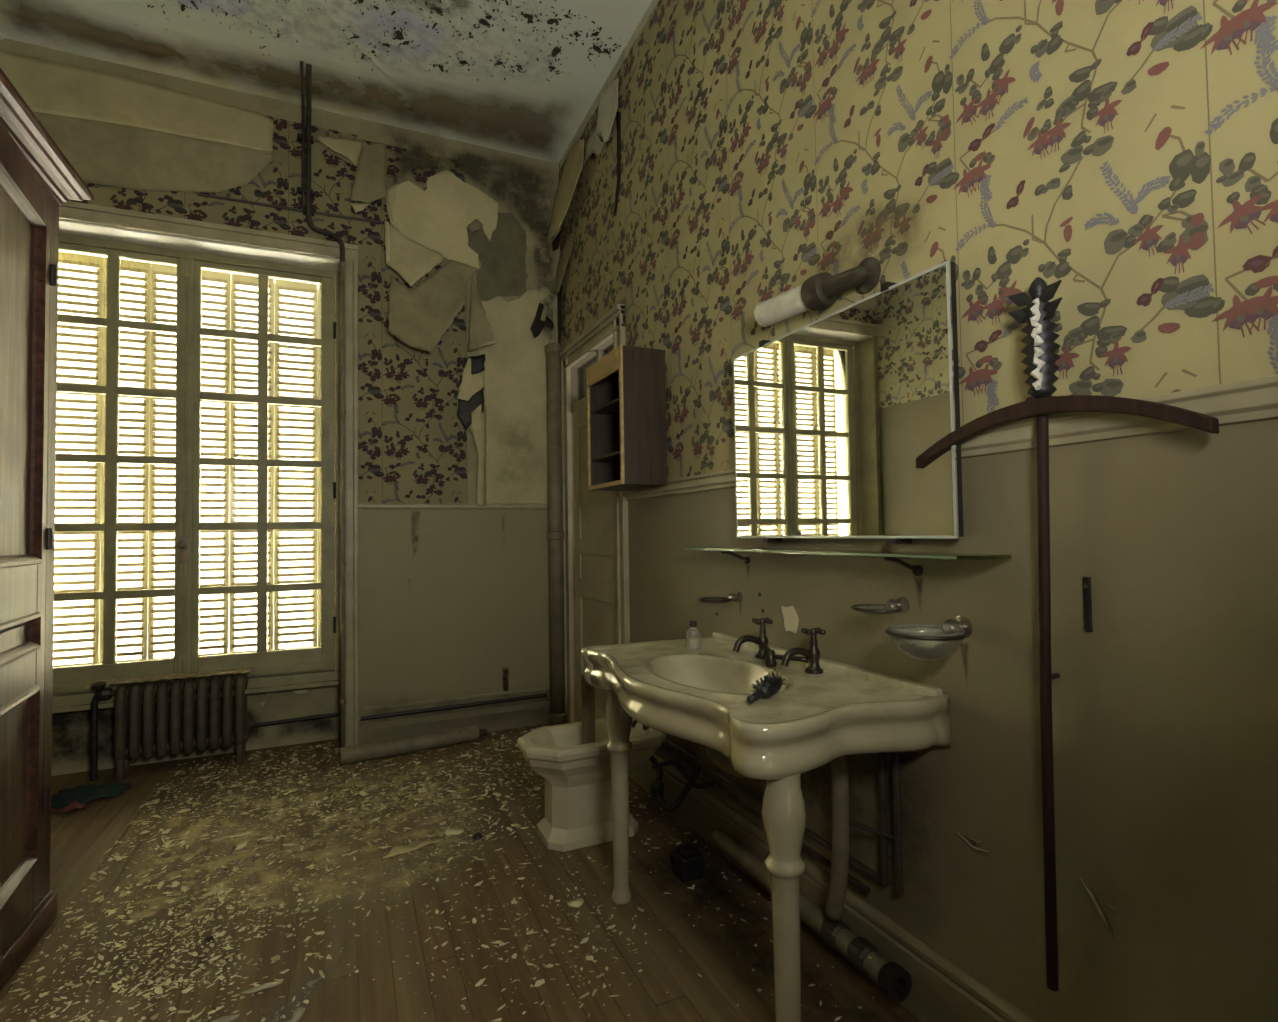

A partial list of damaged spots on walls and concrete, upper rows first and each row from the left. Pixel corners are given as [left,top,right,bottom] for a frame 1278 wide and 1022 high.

leakage [9,0,555,146]
flaking render [386,170,499,269]
flaking render [479,287,557,504]